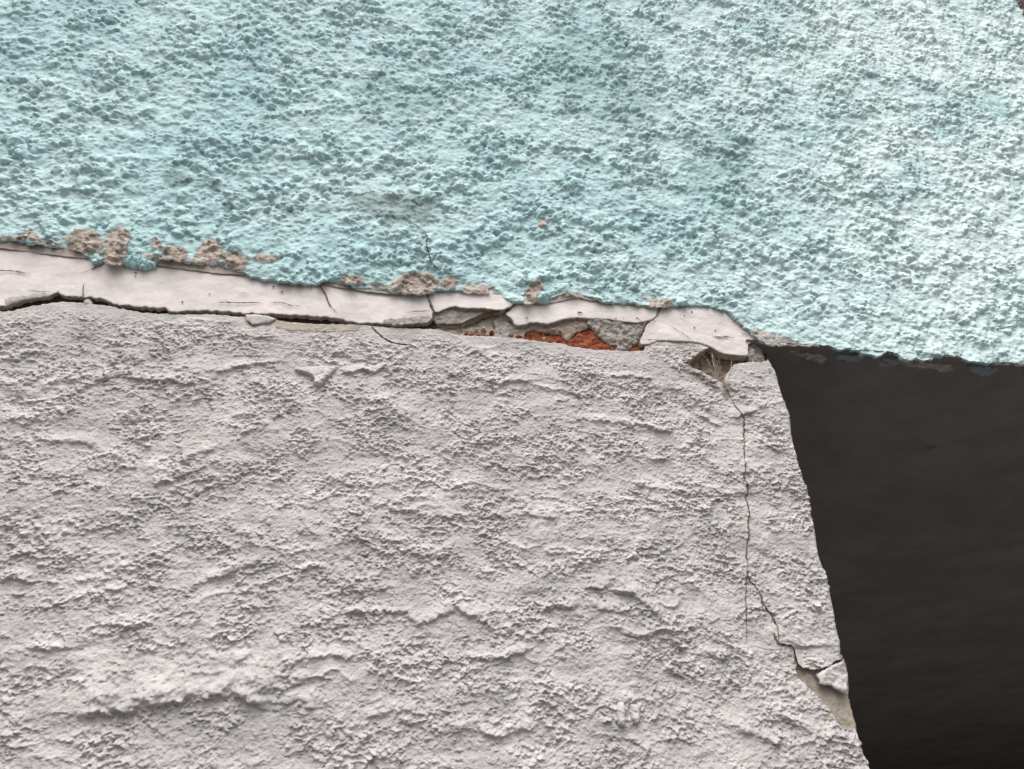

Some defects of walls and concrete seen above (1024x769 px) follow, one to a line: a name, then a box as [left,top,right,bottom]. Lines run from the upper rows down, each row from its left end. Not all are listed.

crack [0,263,171,315]
peeling [0,226,280,270]
crack [201,286,439,349]
spalling [340,269,672,352]
crack [724,384,783,646]
peeling [778,643,857,732]